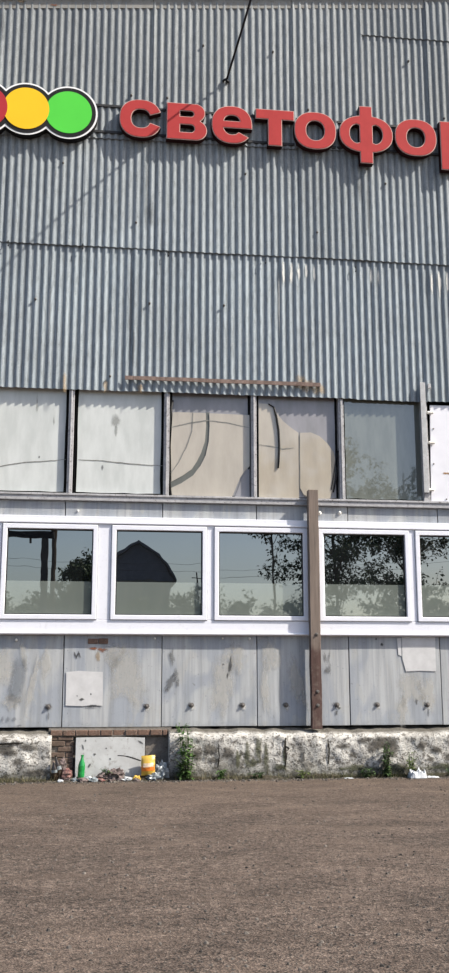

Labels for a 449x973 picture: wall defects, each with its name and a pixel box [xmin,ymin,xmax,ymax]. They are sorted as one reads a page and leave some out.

water stain [236,741,285,769]